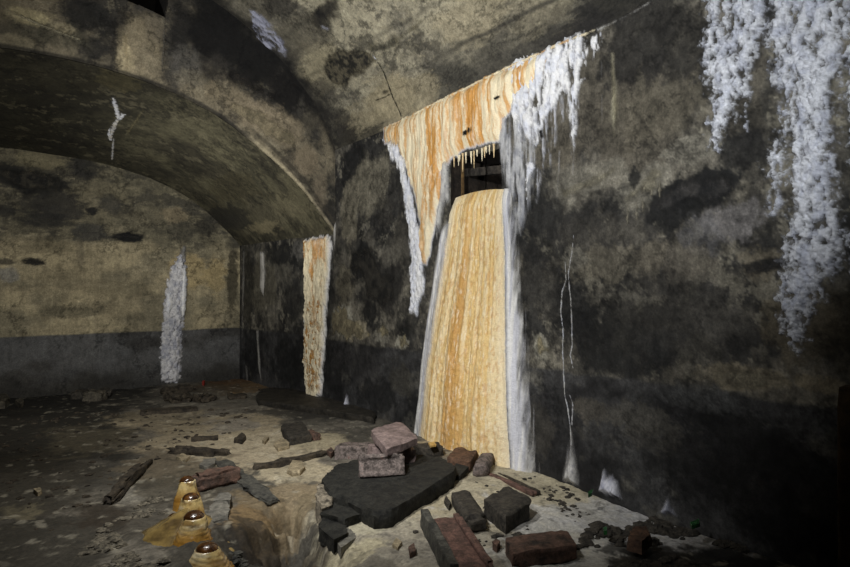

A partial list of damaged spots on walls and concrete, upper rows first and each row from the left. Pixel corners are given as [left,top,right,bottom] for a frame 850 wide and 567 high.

crack [108,98,125,160]
efflorescence [251,11,286,53]
leakage [701,0,850,353]
crack [560,264,575,483]